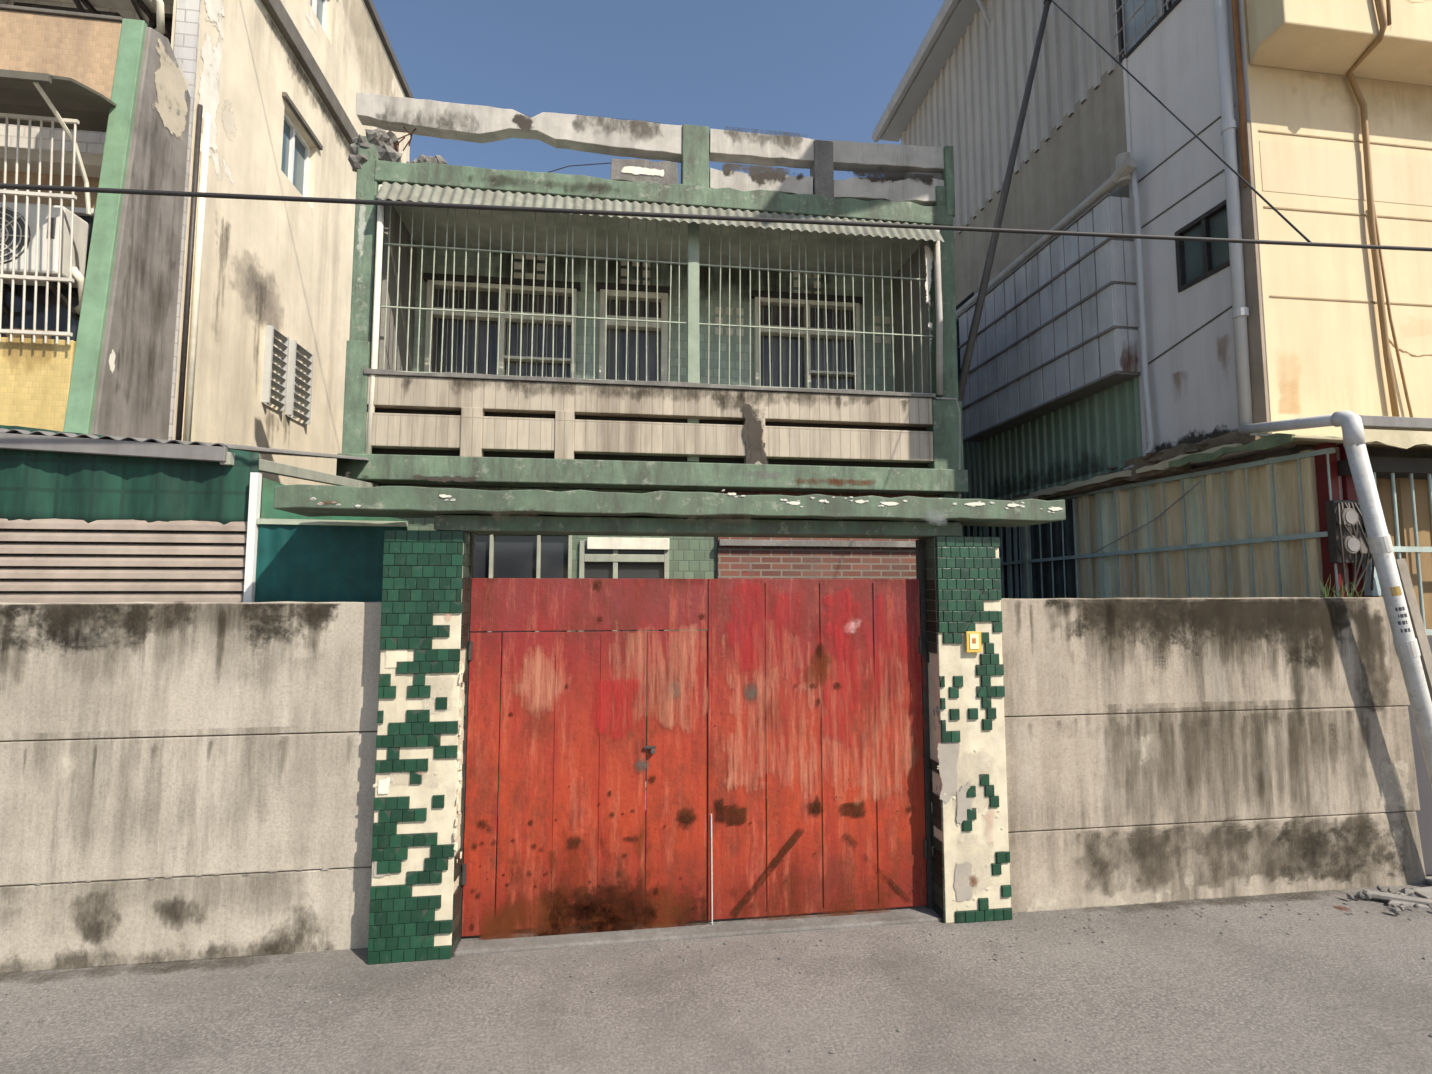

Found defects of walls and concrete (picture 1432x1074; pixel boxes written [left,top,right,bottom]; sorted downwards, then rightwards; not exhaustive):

spalling [348,128,447,172]
spalling [741,404,768,464]
spalling [780,496,907,508]
damp [0,601,191,650]
damp [219,604,338,650]
damp [1072,598,1389,717]
spalling [933,706,1004,844]
rust [715,799,752,825]
rust [808,796,865,817]
rust [529,837,707,937]
rust [732,829,804,917]
damp [1186,815,1404,884]